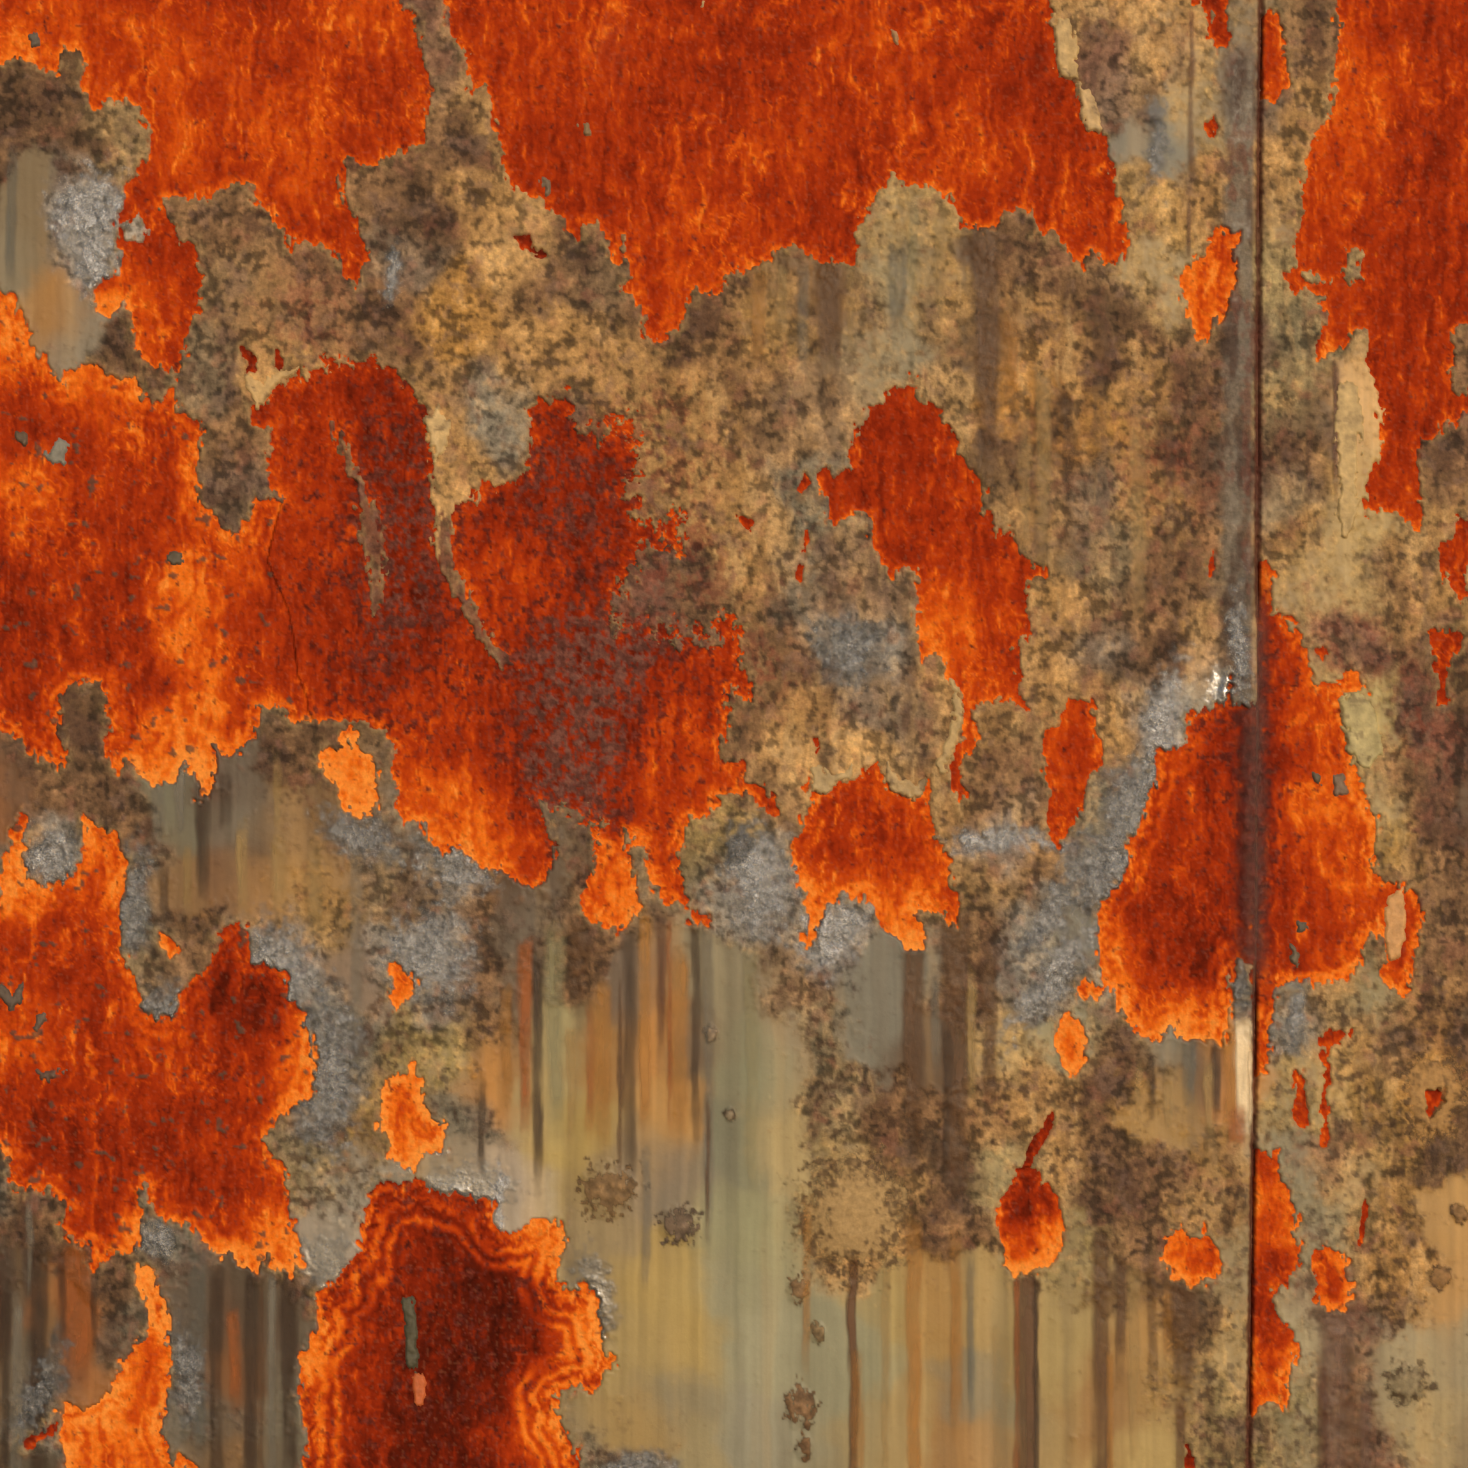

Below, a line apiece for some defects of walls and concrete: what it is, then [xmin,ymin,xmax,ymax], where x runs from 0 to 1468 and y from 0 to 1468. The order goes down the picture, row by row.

corrosion [443,0,1130,343]
peeling [1051,13,1102,134]
corrosion [0,0,780,936]
peeling [885,678,965,799]
peeling [960,657,1189,1026]
peeling [1211,605,1252,706]
corrosion [0,812,319,1468]
water stain [504,919,707,1158]
water stain [1188,1020,1252,1141]
corrosion [297,1061,618,1468]
water stain [847,1261,859,1468]
water stain [1015,1274,1038,1468]